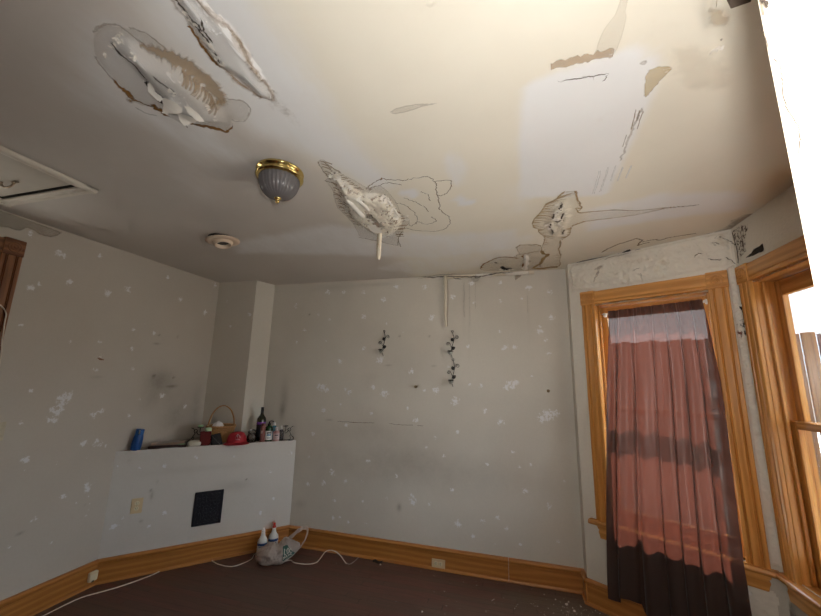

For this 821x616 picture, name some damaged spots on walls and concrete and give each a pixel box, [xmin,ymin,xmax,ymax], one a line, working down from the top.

crack [761,29,802,170]